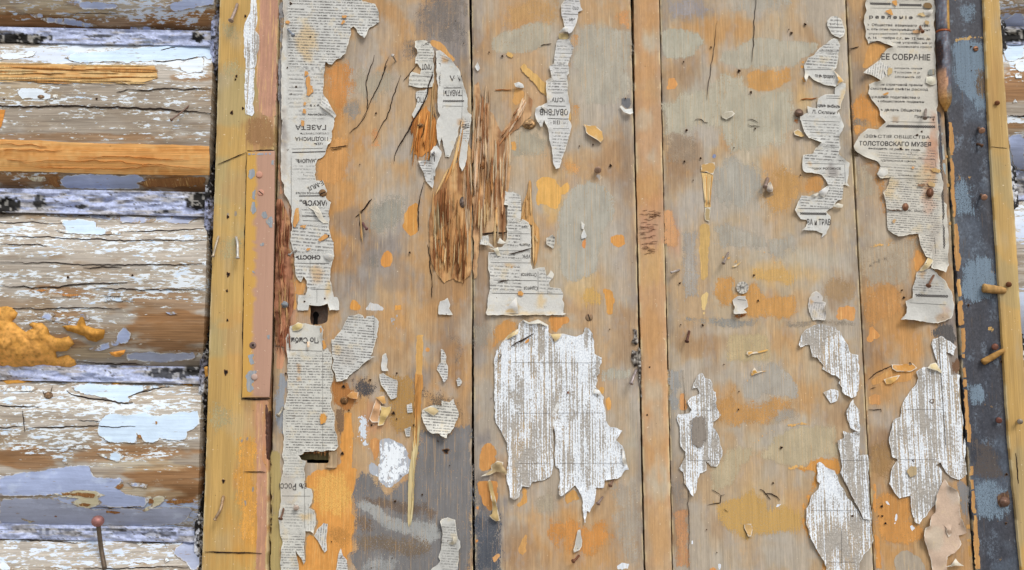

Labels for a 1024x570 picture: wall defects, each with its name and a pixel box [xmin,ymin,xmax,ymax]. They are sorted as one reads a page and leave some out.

peeling [0,51,37,60]
peeling [65,45,212,73]
peeling [17,88,58,100]
crack [330,57,437,161]
peeling [851,92,882,136]
peeling [49,174,206,190]
peeling [47,214,199,235]
peeling [87,327,198,363]
peeling [73,383,200,463]
peeling [0,456,195,528]
peeling [796,457,841,570]
peeling [164,542,200,570]